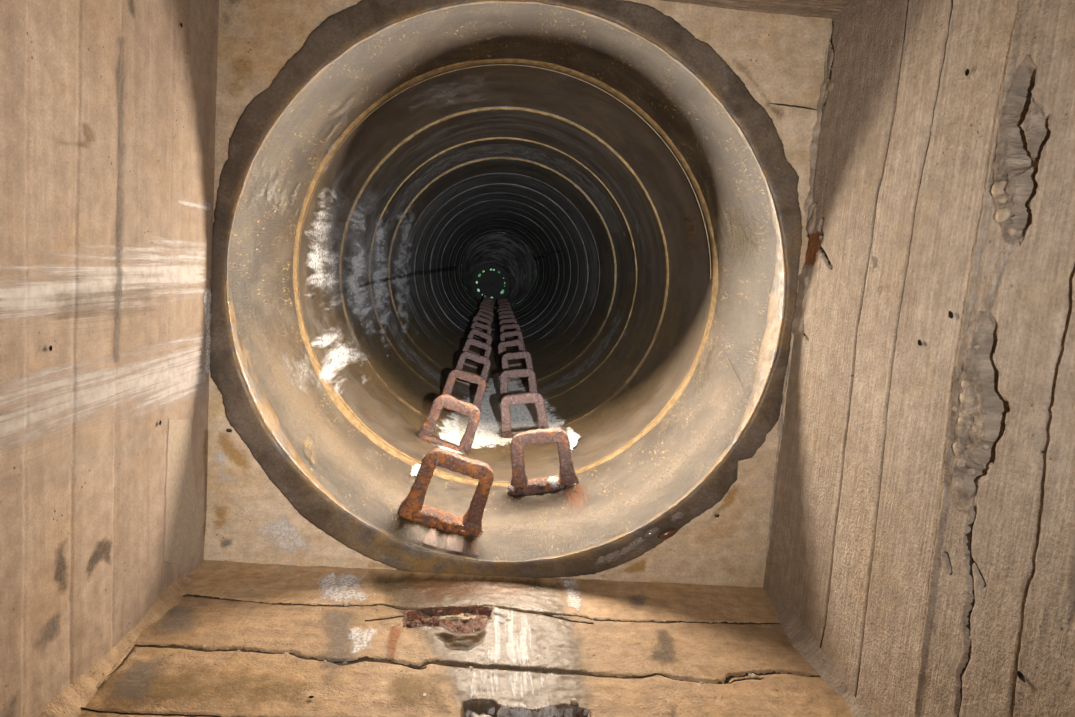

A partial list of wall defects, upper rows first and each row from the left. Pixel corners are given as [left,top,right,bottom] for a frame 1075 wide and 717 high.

leakage [0,41,211,448]
rust [805,232,821,265]
leakage [56,556,66,584]
leakage [89,541,110,571]
crack [182,594,781,626]
leakage [373,565,586,717]
crack [80,644,820,717]